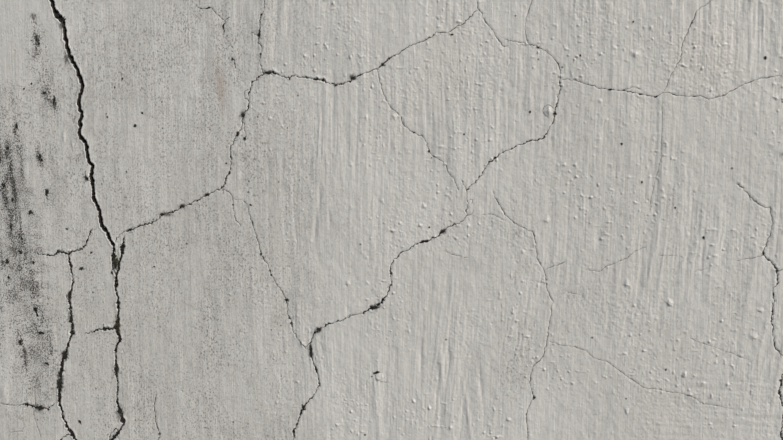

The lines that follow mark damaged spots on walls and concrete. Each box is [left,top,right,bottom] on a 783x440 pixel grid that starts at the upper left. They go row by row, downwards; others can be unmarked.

crack [4,230,92,440]
crack [49,0,200,440]
crack [205,0,760,438]
crack [738,184,782,355]
crack [775,374,783,440]